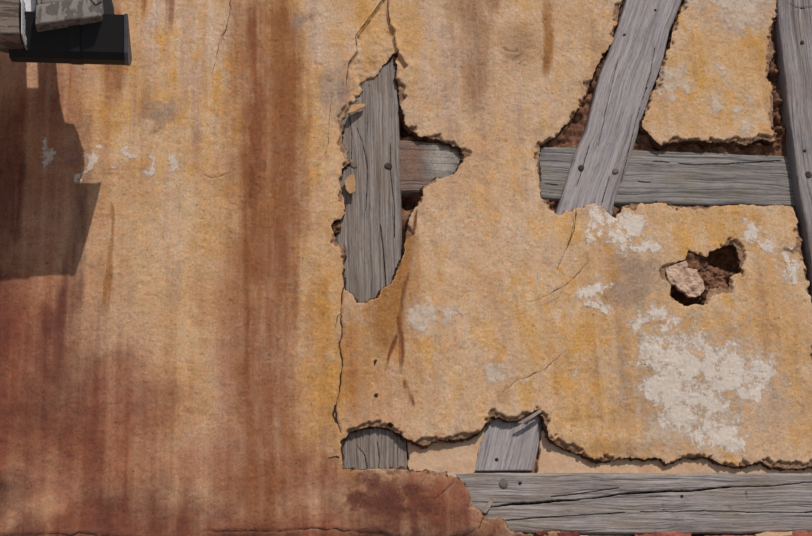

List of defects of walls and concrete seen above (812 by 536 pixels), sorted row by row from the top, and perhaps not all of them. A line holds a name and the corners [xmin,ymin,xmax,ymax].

damp [42,137,103,184]
flaking render [331,49,464,303]
flaking render [538,0,624,189]
peeling [562,202,663,257]
flaking render [638,0,777,150]
crack [328,258,345,460]
peeling [340,218,812,472]
crack [0,528,108,536]
damp [348,476,431,513]